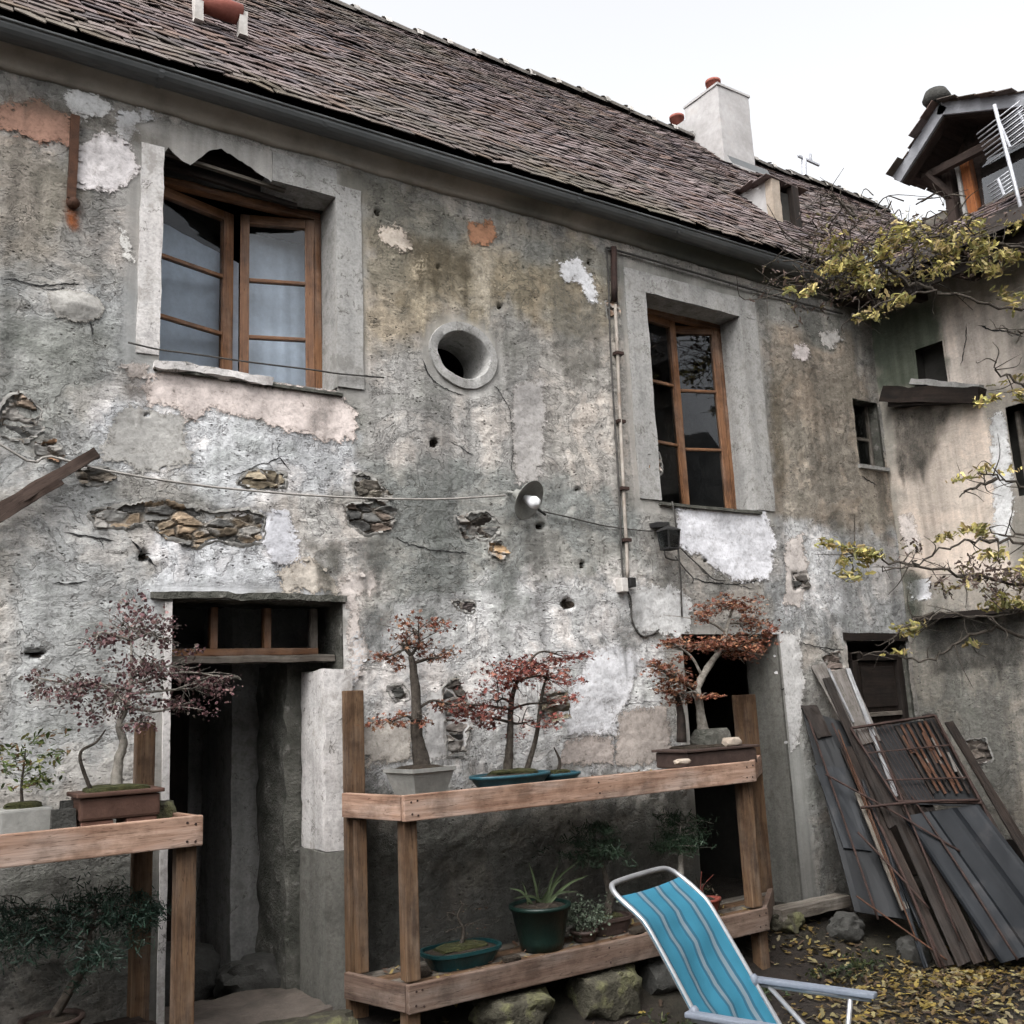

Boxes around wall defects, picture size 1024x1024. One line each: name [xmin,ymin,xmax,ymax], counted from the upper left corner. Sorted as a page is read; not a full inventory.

peeling [0,89,161,194]
peeling [467,218,497,247]
peeling [556,256,621,320]
spalling [0,390,65,464]
peeling [117,362,359,444]
spalling [86,498,380,687]
spalling [344,471,398,537]
spalling [453,509,511,559]
peeling [675,507,811,610]
spalling [441,673,473,759]